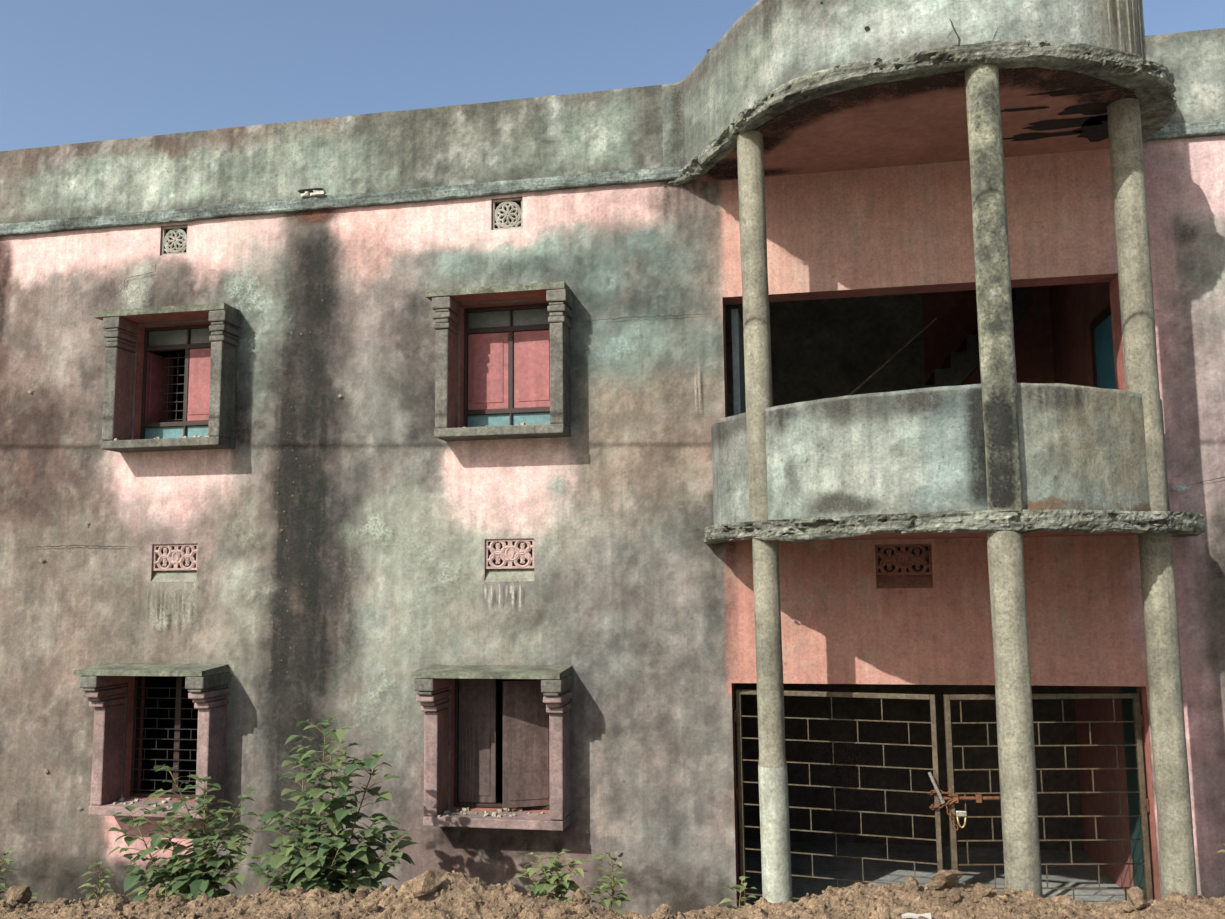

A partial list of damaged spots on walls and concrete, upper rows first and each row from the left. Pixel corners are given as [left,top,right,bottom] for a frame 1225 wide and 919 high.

flaking render [1001,86,1117,142]
damp [125,232,398,888]